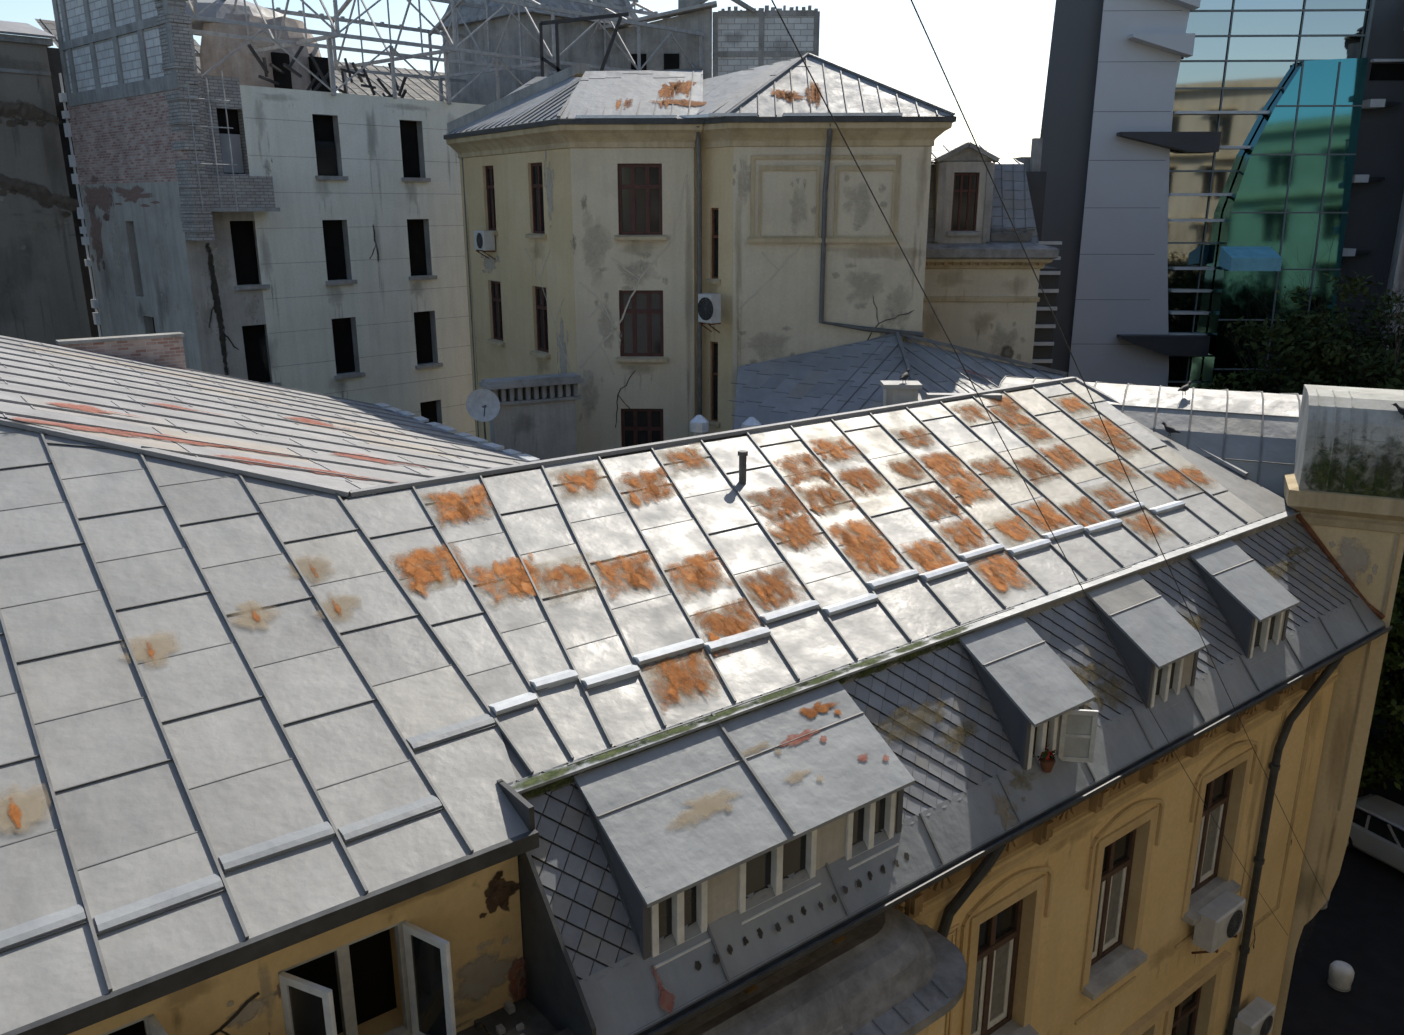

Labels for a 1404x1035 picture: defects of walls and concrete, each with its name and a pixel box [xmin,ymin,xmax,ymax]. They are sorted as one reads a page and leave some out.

corrosion [653,80,707,108]
corrosion [771,82,821,106]
spalling [84,176,160,271]
crack [205,243,239,375]
corrosion [14,402,430,482]
corrosion [559,467,604,496]
corrosion [622,444,709,505]
corrosion [747,396,1162,592]
corrosion [396,546,797,706]
corrosion [743,702,841,755]
peeling [480,871,521,919]
crack [210,992,260,1035]